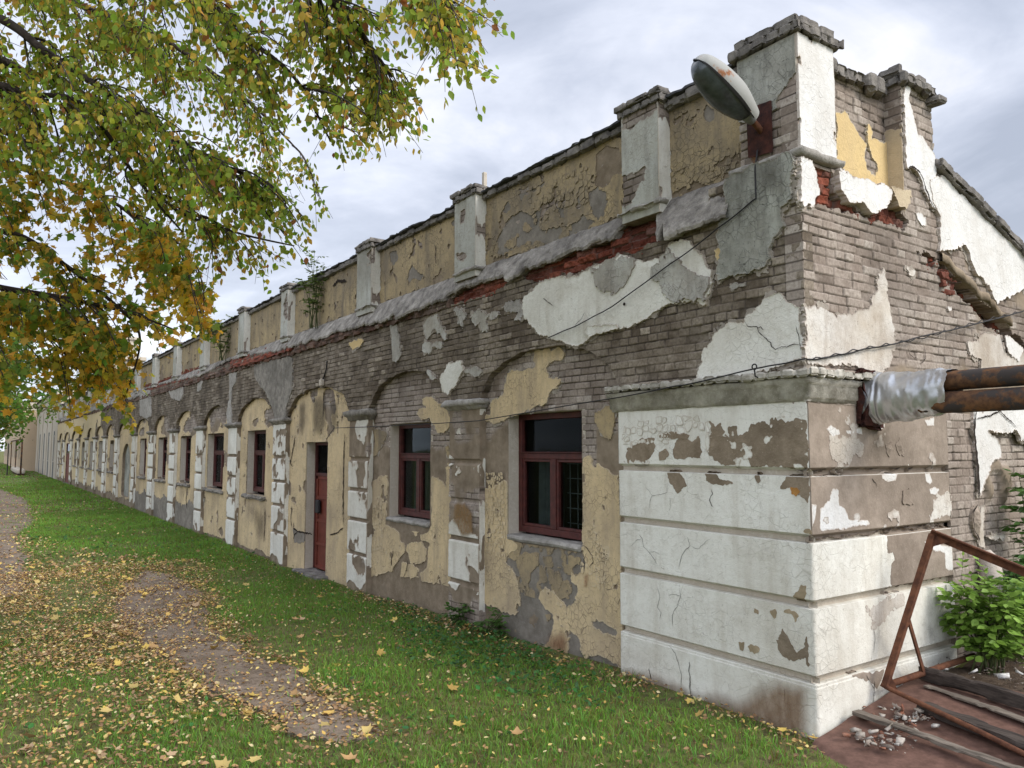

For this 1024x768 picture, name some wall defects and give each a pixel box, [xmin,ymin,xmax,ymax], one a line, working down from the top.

flaking render [422,85,1024,427]
peeling [594,401,953,630]
flaking render [372,531,449,611]
flaking render [485,472,585,646]
flaking render [568,631,619,668]
flaking render [593,620,617,636]
peeling [776,629,810,667]